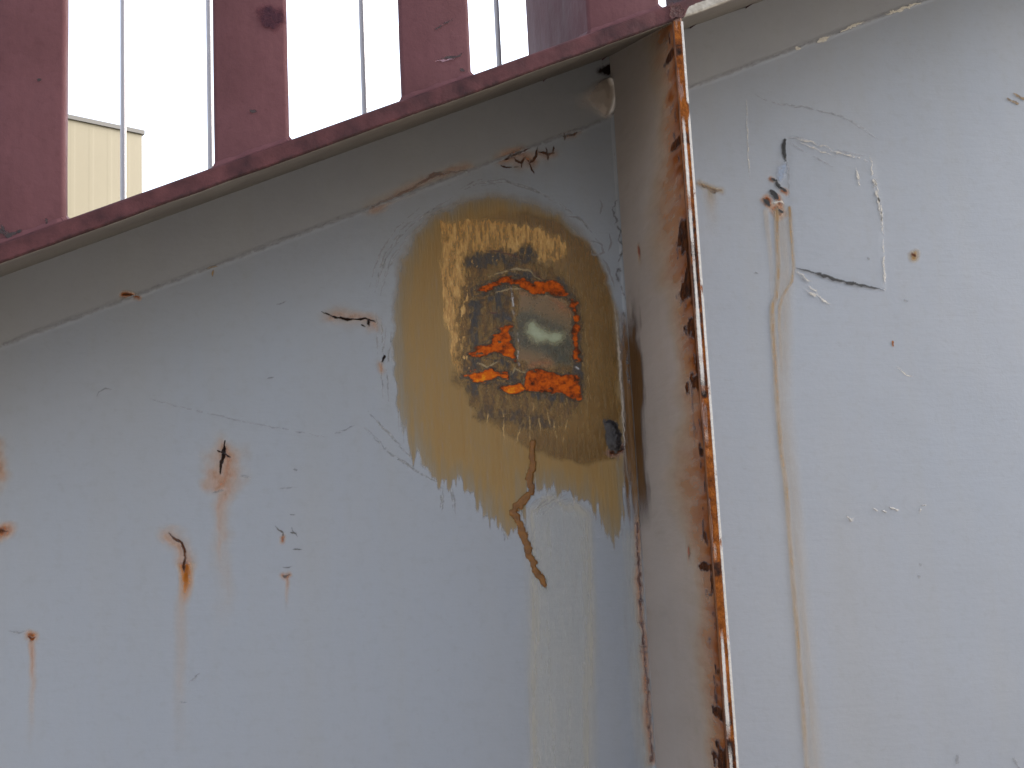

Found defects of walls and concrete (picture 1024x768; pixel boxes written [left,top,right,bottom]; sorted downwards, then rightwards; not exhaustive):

crack [501,132,577,173]
crack [778,138,789,188]
crack [797,268,881,304]
crack [321,311,376,327]
peeling [374,179,630,548]
rust [656,21,739,768]
leakage [614,305,649,550]
rust [762,177,806,743]
rust [179,563,192,595]